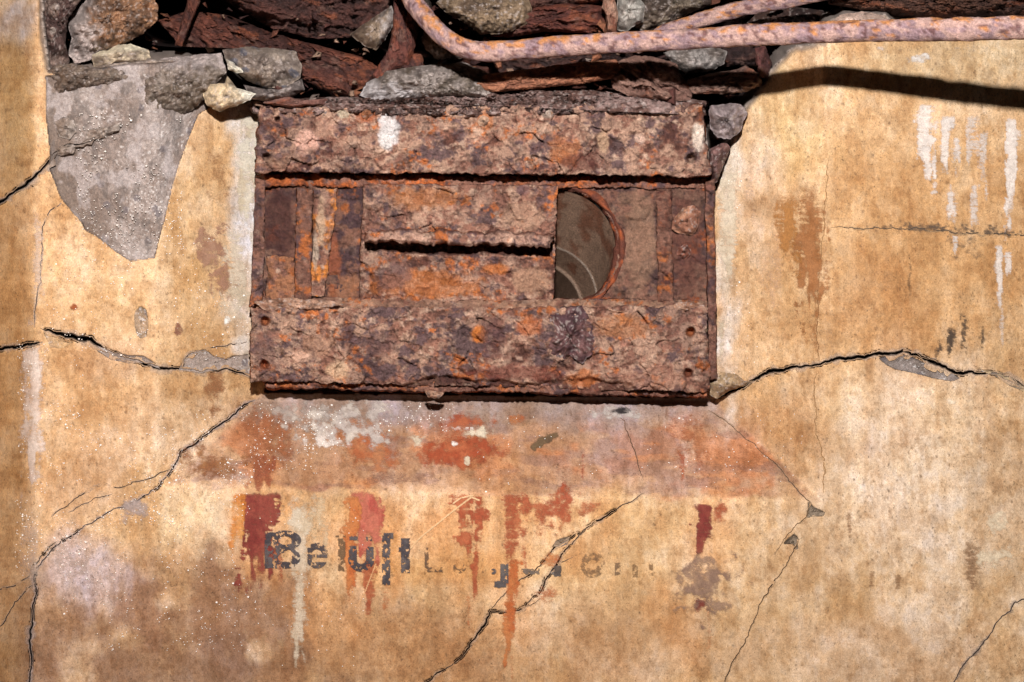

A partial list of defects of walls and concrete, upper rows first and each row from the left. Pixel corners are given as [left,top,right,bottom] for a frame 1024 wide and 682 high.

spalling [45,61,210,262]
crack [0,202,256,682]
peeling [193,227,229,295]
corrosion [183,407,292,591]
corrosion [253,298,344,311]
corrosion [425,390,444,399]
crack [425,414,645,682]
leakage [773,192,831,333]
crack [708,155,1024,682]
spalling [879,354,959,381]
leakage [936,316,967,354]
leakage [900,105,1021,328]